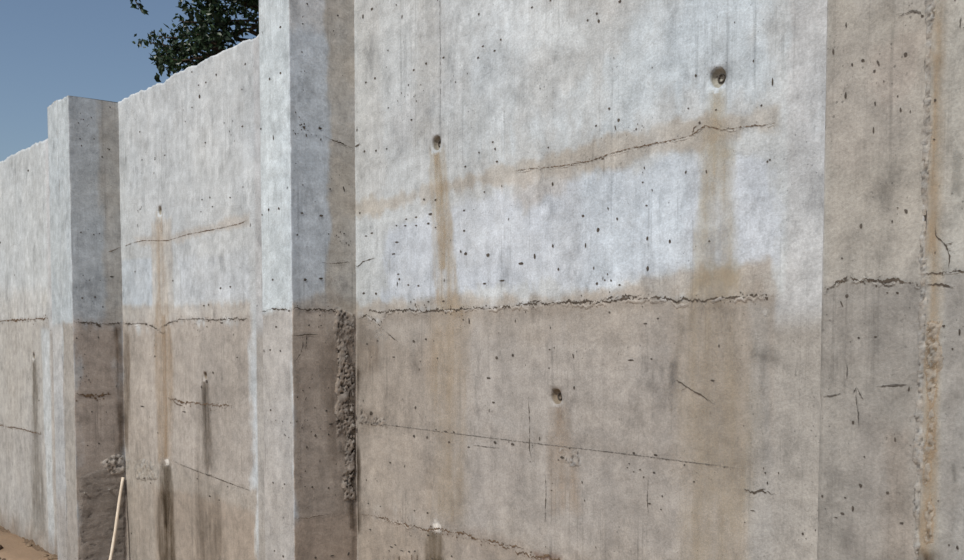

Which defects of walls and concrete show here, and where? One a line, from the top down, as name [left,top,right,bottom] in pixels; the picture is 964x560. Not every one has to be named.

crack [516,123,774,173]
crack [109,222,240,252]
crack [824,227,964,295]
crack [0,315,48,325]
crack [76,291,768,360]
crack [371,512,562,560]